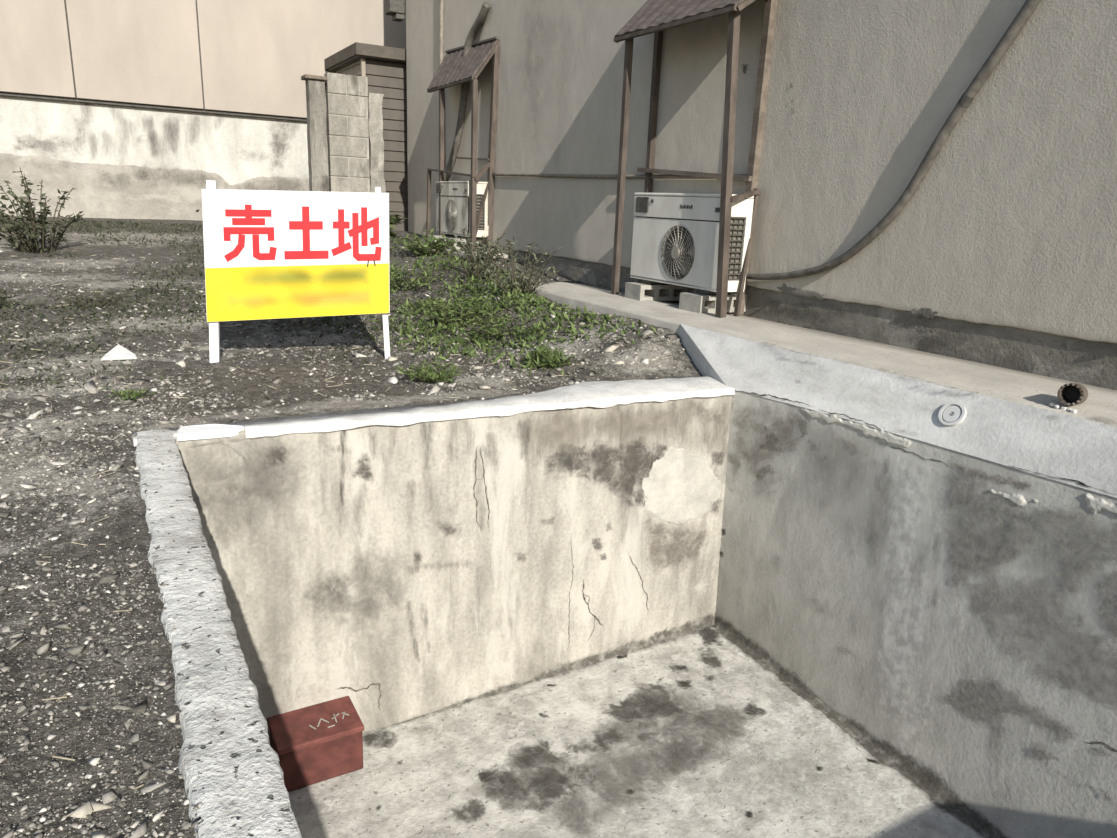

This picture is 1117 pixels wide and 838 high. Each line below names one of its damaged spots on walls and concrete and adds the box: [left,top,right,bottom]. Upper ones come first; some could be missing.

spalling [777,283,825,300]
spalling [908,308,938,319]
crack [473,447,490,526]
damp [540,410,687,504]
crack [568,537,603,643]
spalling [132,324,1117,838]
damp [936,470,1117,704]
crack [339,683,381,711]
damp [453,472,1005,838]
damp [947,682,1072,747]